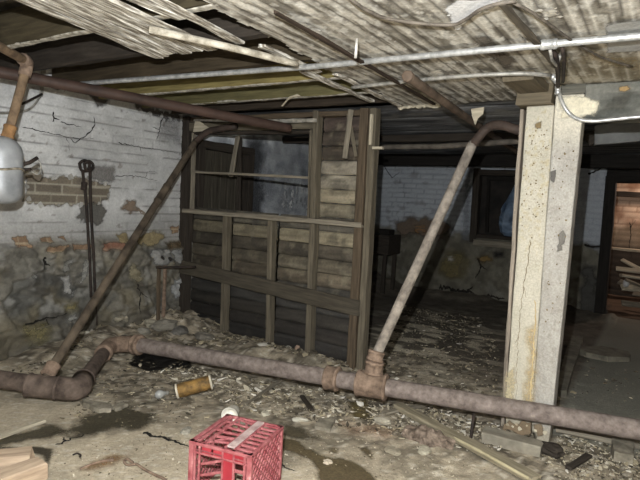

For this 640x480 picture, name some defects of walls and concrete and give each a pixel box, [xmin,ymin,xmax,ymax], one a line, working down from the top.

crack [22,112,95,150]
crack [118,114,175,153]
peeling [22,166,115,226]
flaking render [12,236,33,248]
peeling [552,226,566,251]
crack [515,242,531,398]
water stain [32,447,52,464]
water stain [0,407,153,449]
crack [143,432,189,447]